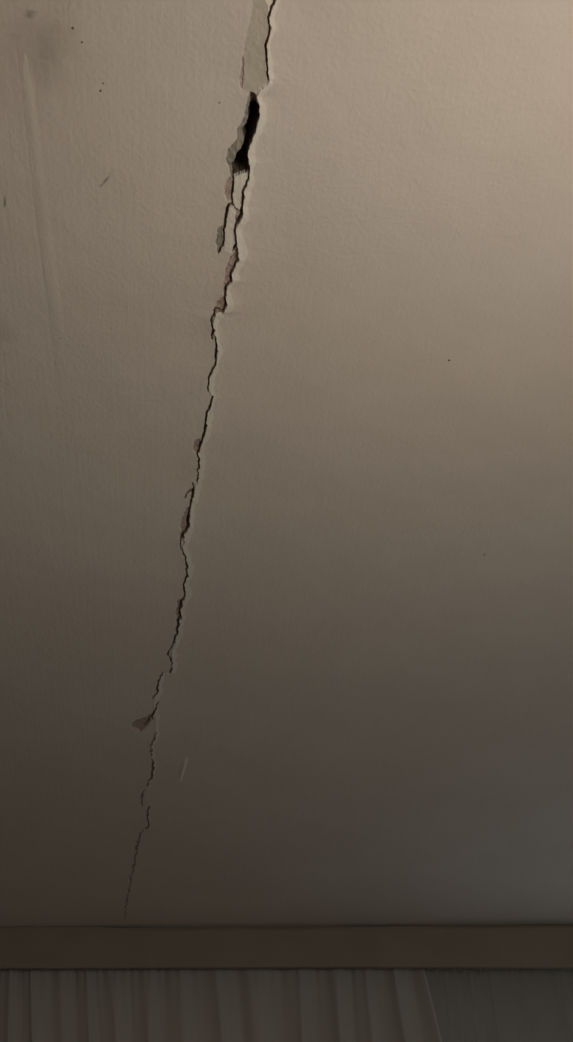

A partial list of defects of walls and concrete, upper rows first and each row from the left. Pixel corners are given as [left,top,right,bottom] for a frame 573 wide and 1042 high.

crack [124,0,280,920]
flaking render [215,92,260,314]